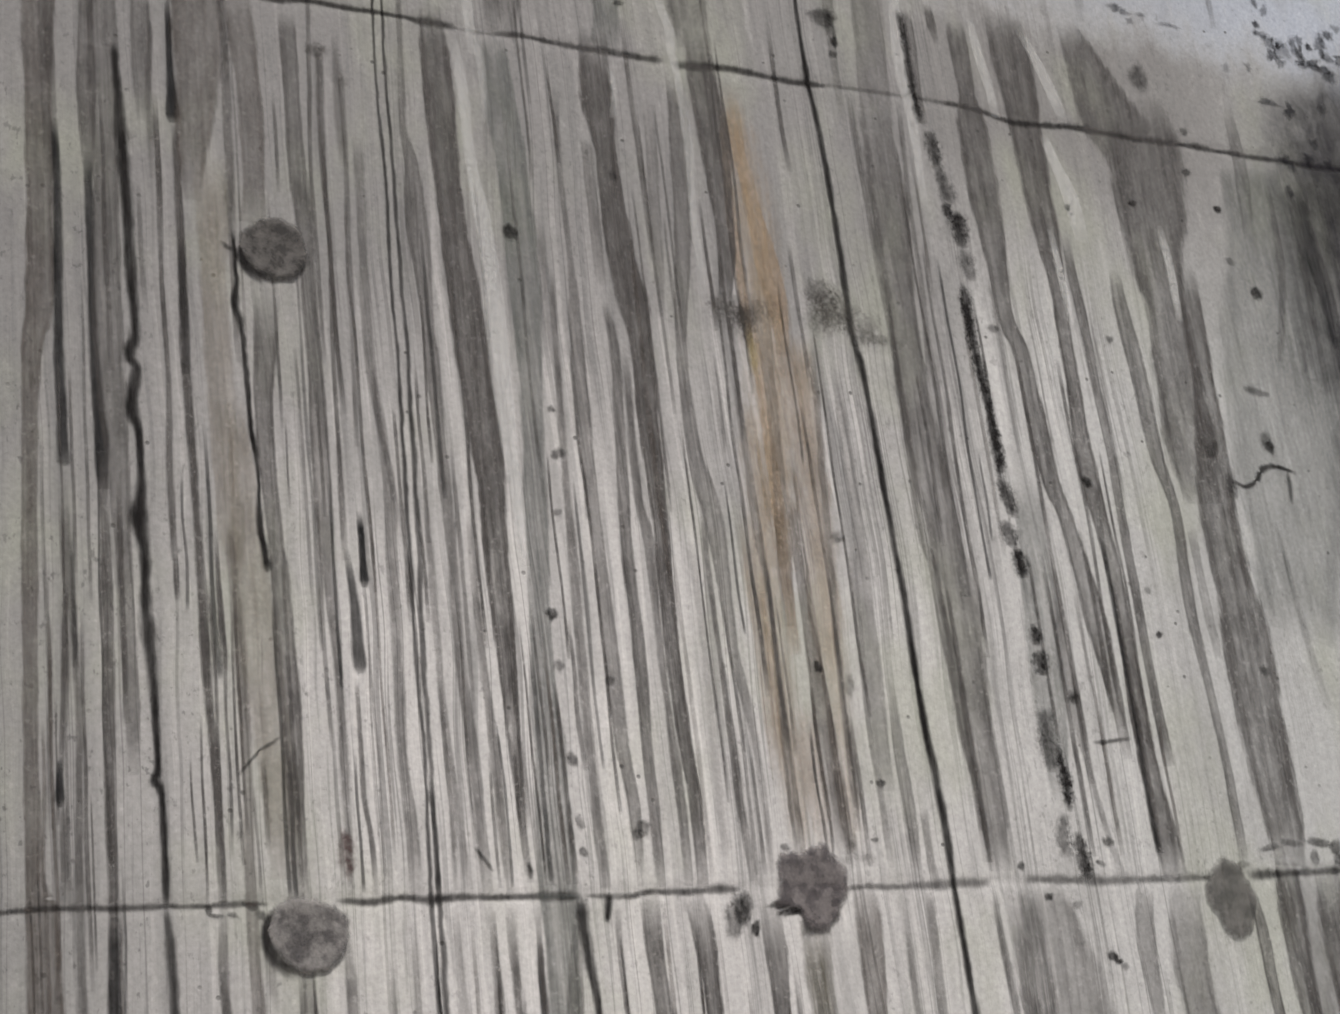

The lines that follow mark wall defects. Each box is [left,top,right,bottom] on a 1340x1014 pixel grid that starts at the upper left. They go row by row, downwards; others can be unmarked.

crack [0,48,260,1014]
crack [225,237,270,568]
crack [272,0,735,1014]
crack [508,0,979,1014]
crack [1031,626,1047,674]
crack [1041,694,1102,882]
crack [897,16,1311,576]
crack [1256,867,1340,878]
leakage [1291,93,1340,374]